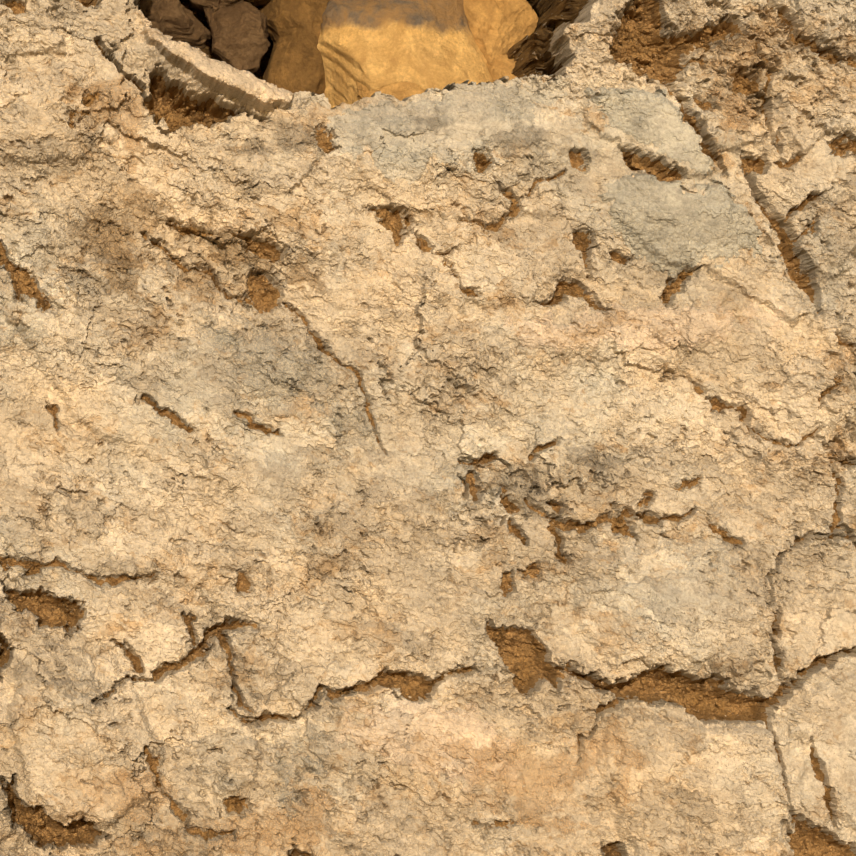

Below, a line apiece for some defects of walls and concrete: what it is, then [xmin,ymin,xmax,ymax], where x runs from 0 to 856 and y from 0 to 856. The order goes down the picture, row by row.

spalling [179,0,216,59]
spalling [253,36,274,80]
spalling [315,0,589,185]
crack [660,82,716,162]
crack [751,193,823,314]
crack [524,492,692,538]
crack [828,461,856,548]
crack [93,614,472,725]
crack [287,837,310,856]